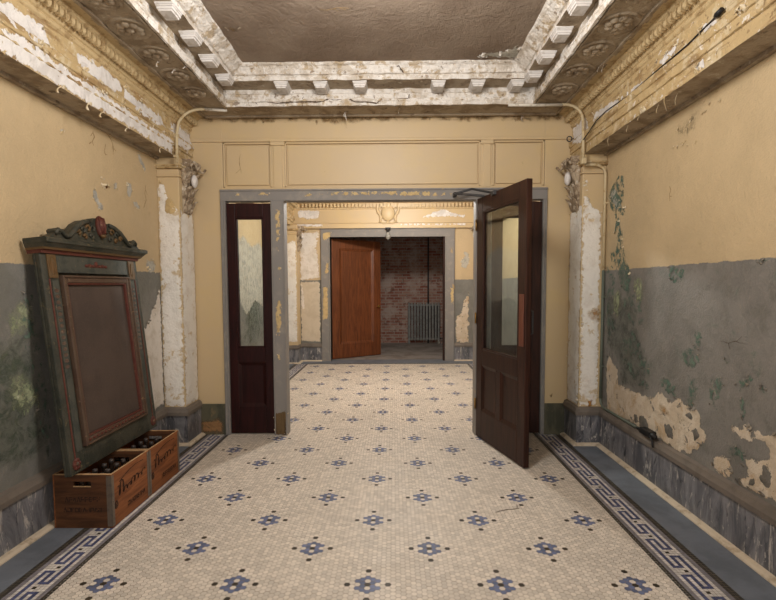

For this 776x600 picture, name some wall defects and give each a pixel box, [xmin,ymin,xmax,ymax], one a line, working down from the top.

peeling [0,0,194,154]
peeling [569,81,642,144]
peeling [654,42,678,65]
peeling [144,181,200,410]
peeling [450,288,469,343]
peeling [566,175,706,454]
peeling [709,375,776,501]